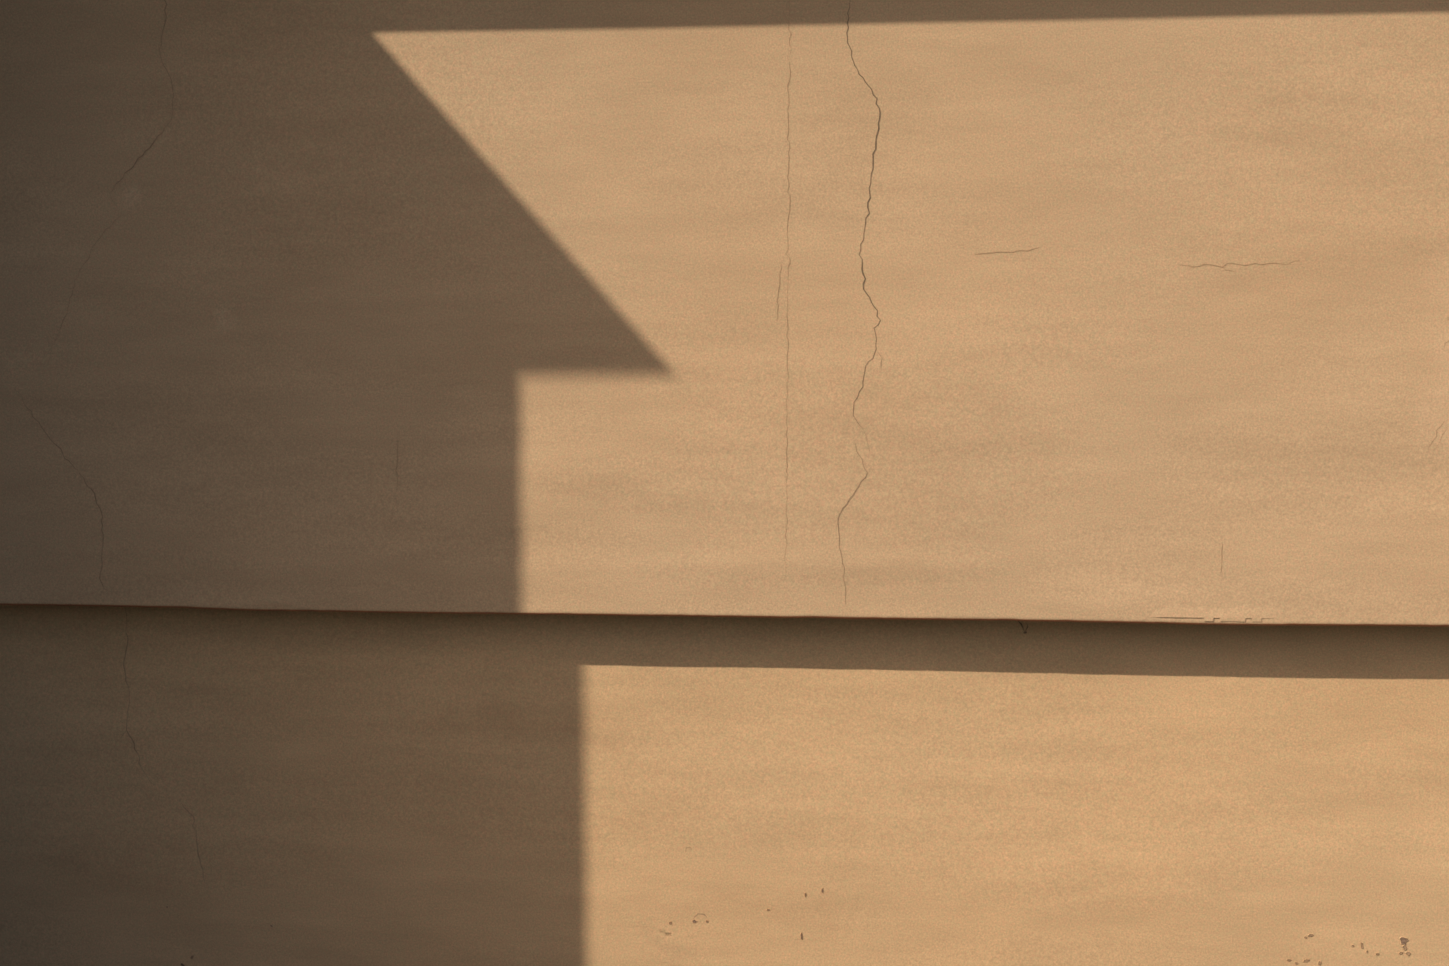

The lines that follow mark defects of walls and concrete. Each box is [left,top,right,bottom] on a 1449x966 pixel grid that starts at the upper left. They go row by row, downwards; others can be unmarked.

crack [837,2,882,604]